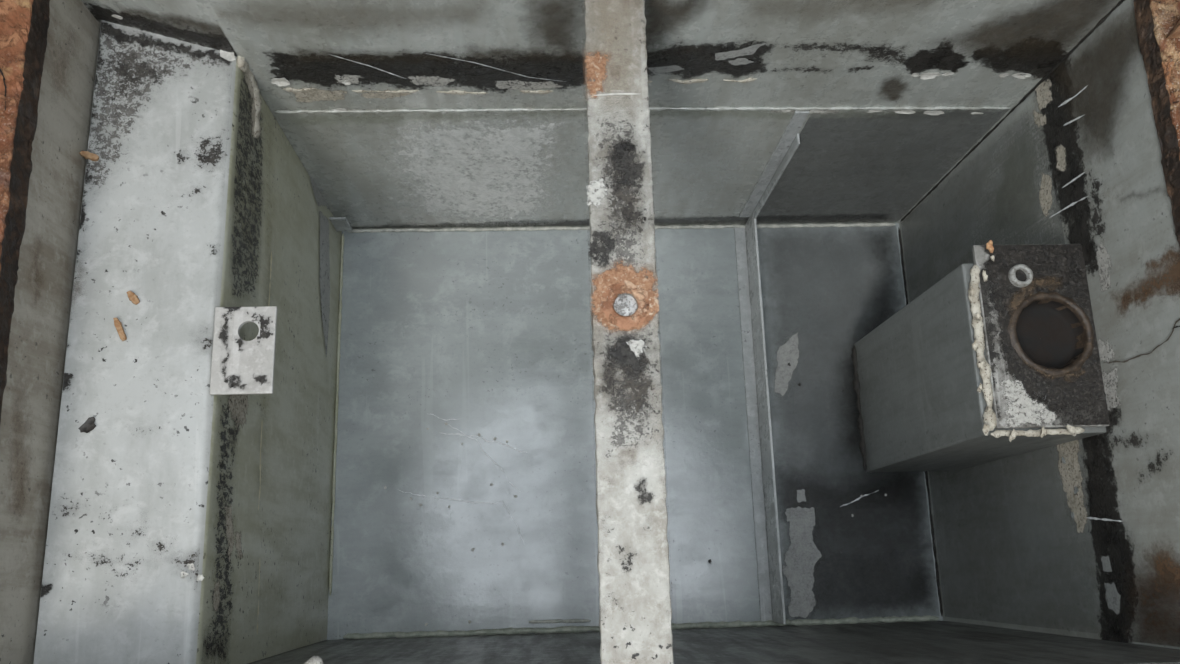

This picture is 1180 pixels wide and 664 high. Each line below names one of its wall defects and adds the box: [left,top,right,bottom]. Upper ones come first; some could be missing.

crack [0,69,8,110]
corrosion [585,52,609,98]
water stain [784,42,907,73]
water stain [375,114,565,225]
water stain [586,132,654,268]
corrosion [591,261,659,331]
water stain [597,323,660,424]
peeling [774,333,799,396]
crack [1104,319,1180,364]
peeling [1000,379,1087,533]
peeling [782,489,822,618]
corrosion [1135,551,1180,646]